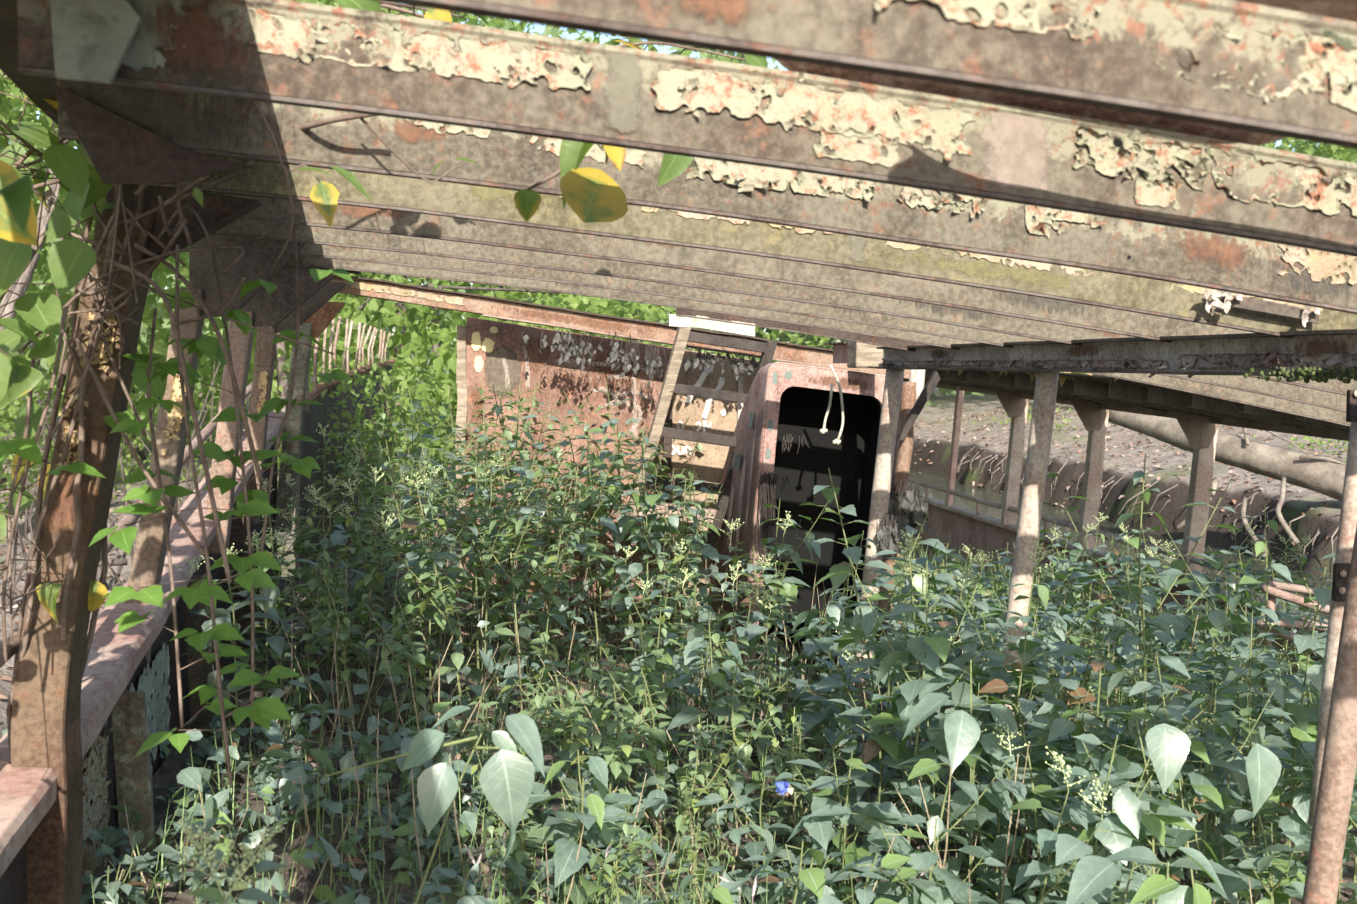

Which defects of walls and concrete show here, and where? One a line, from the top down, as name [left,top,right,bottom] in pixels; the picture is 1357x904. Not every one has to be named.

peeling [875,0,891,12]
peeling [929,0,1104,41]
peeling [249,8,593,90]
peeling [1156,17,1357,112]
peeling [650,67,977,167]
peeling [686,157,876,202]
peeling [1073,126,1357,216]
peeling [1025,205,1106,239]
peeling [1278,244,1357,285]
rust [520,338,559,371]
rust [583,354,640,393]
rust [471,387,483,427]